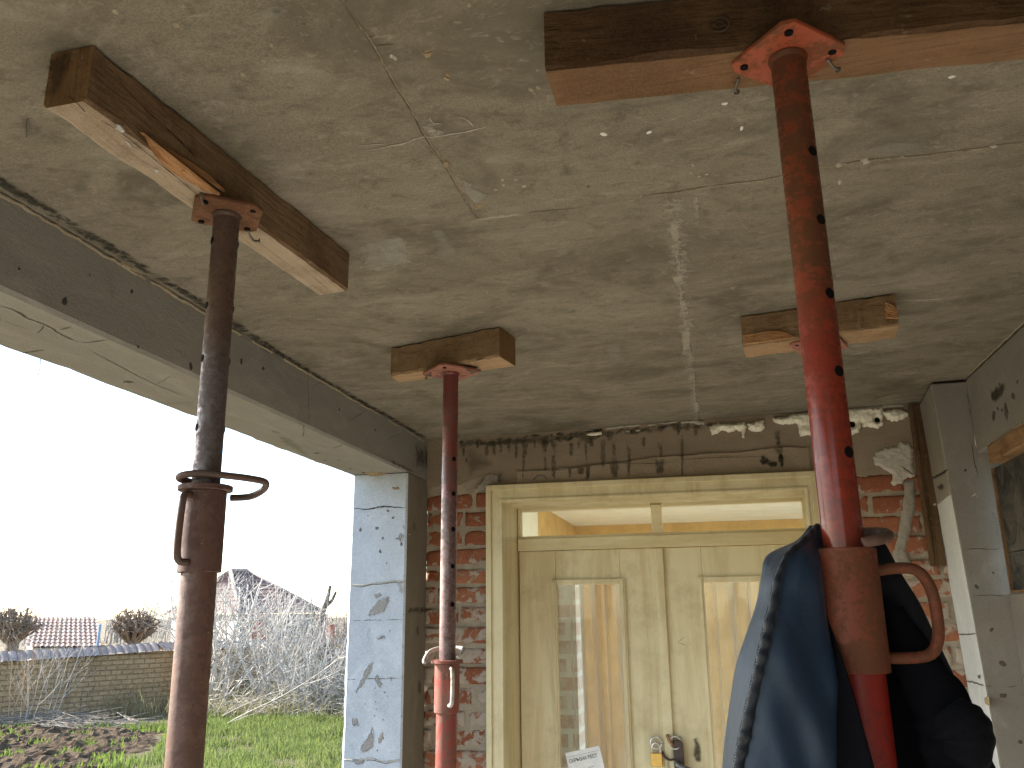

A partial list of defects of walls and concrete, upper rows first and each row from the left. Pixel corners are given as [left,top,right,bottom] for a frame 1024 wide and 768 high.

crack [341,0,489,219]
water stain [460,200,711,478]
peeling [369,593,388,616]
peeling [356,663,403,693]
peeling [352,718,384,765]